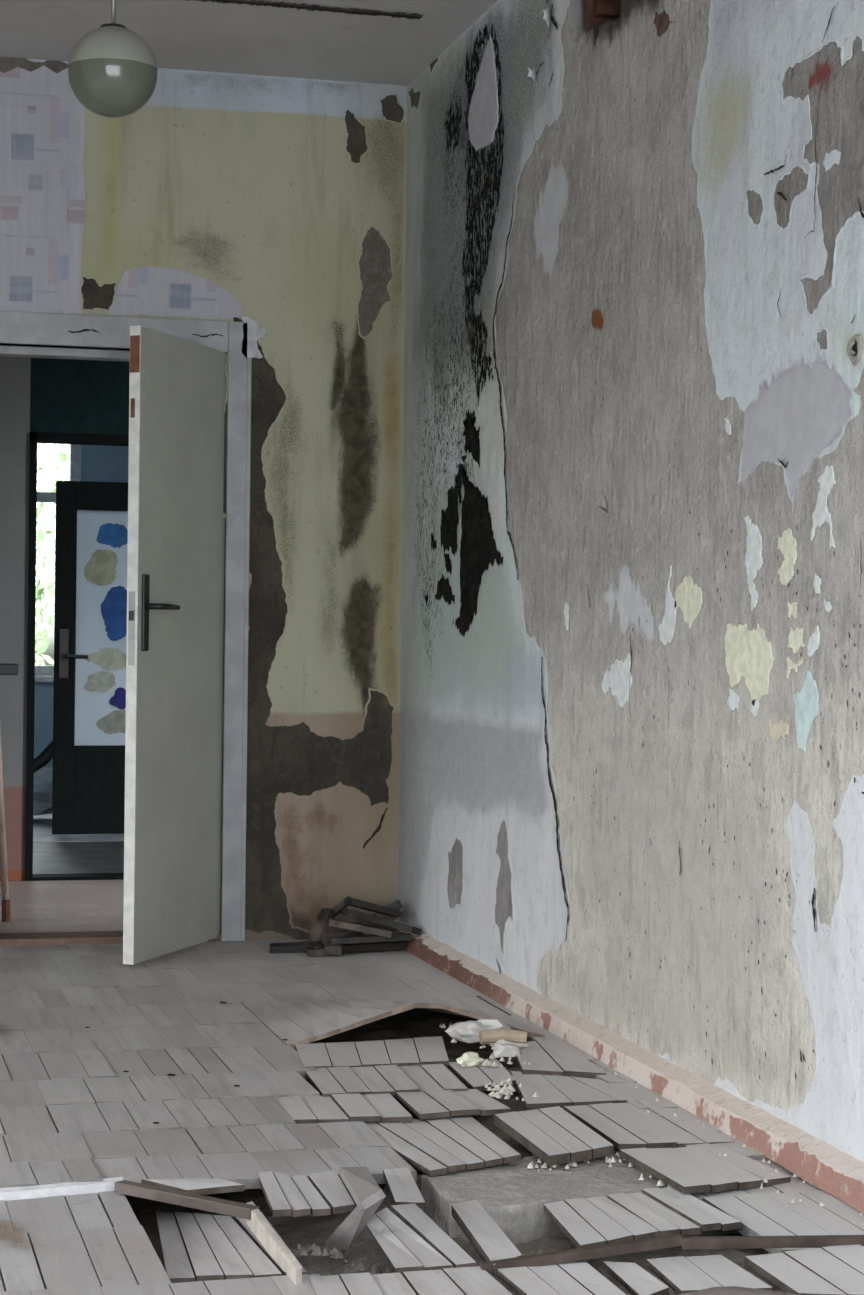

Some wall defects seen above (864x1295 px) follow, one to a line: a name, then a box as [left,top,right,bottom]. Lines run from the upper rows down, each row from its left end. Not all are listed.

crack [186,0,423,19]
flaking render [223,316,396,940]
damp [152,0,565,934]
flaking render [494,0,864,1119]